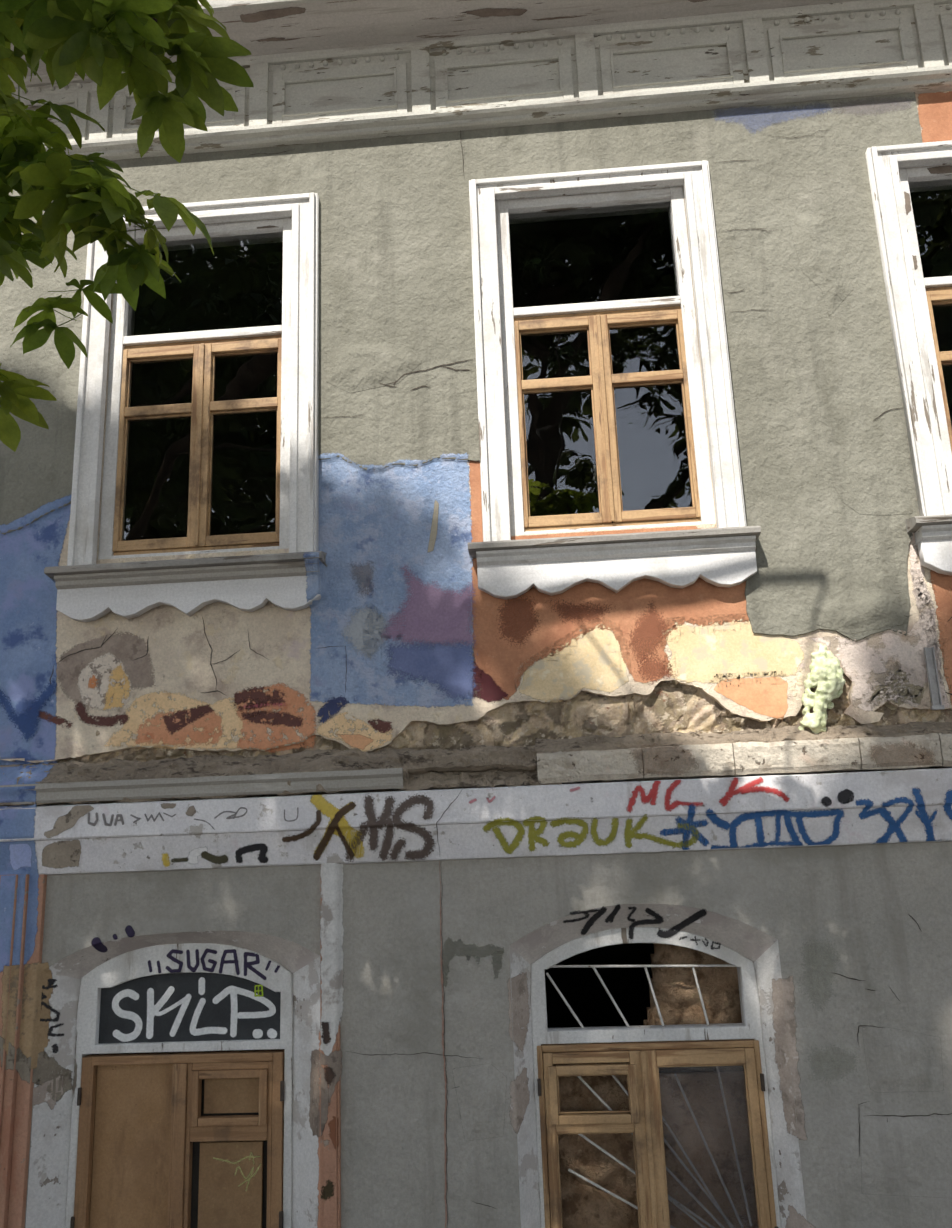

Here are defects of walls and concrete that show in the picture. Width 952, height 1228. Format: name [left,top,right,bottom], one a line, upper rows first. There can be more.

peeling [465,8,527,17]
crack [380,359,473,391]
crack [200,617,267,695]
peeling [519,624,629,703]
peeling [664,533,950,721]
peeling [315,710,394,752]
peeling [0,962,73,1110]
peeling [309,863,344,1228]
peeling [507,972,529,1051]
peeling [772,976,807,1141]
peeling [509,1067,530,1134]
peeling [785,1205,815,1228]